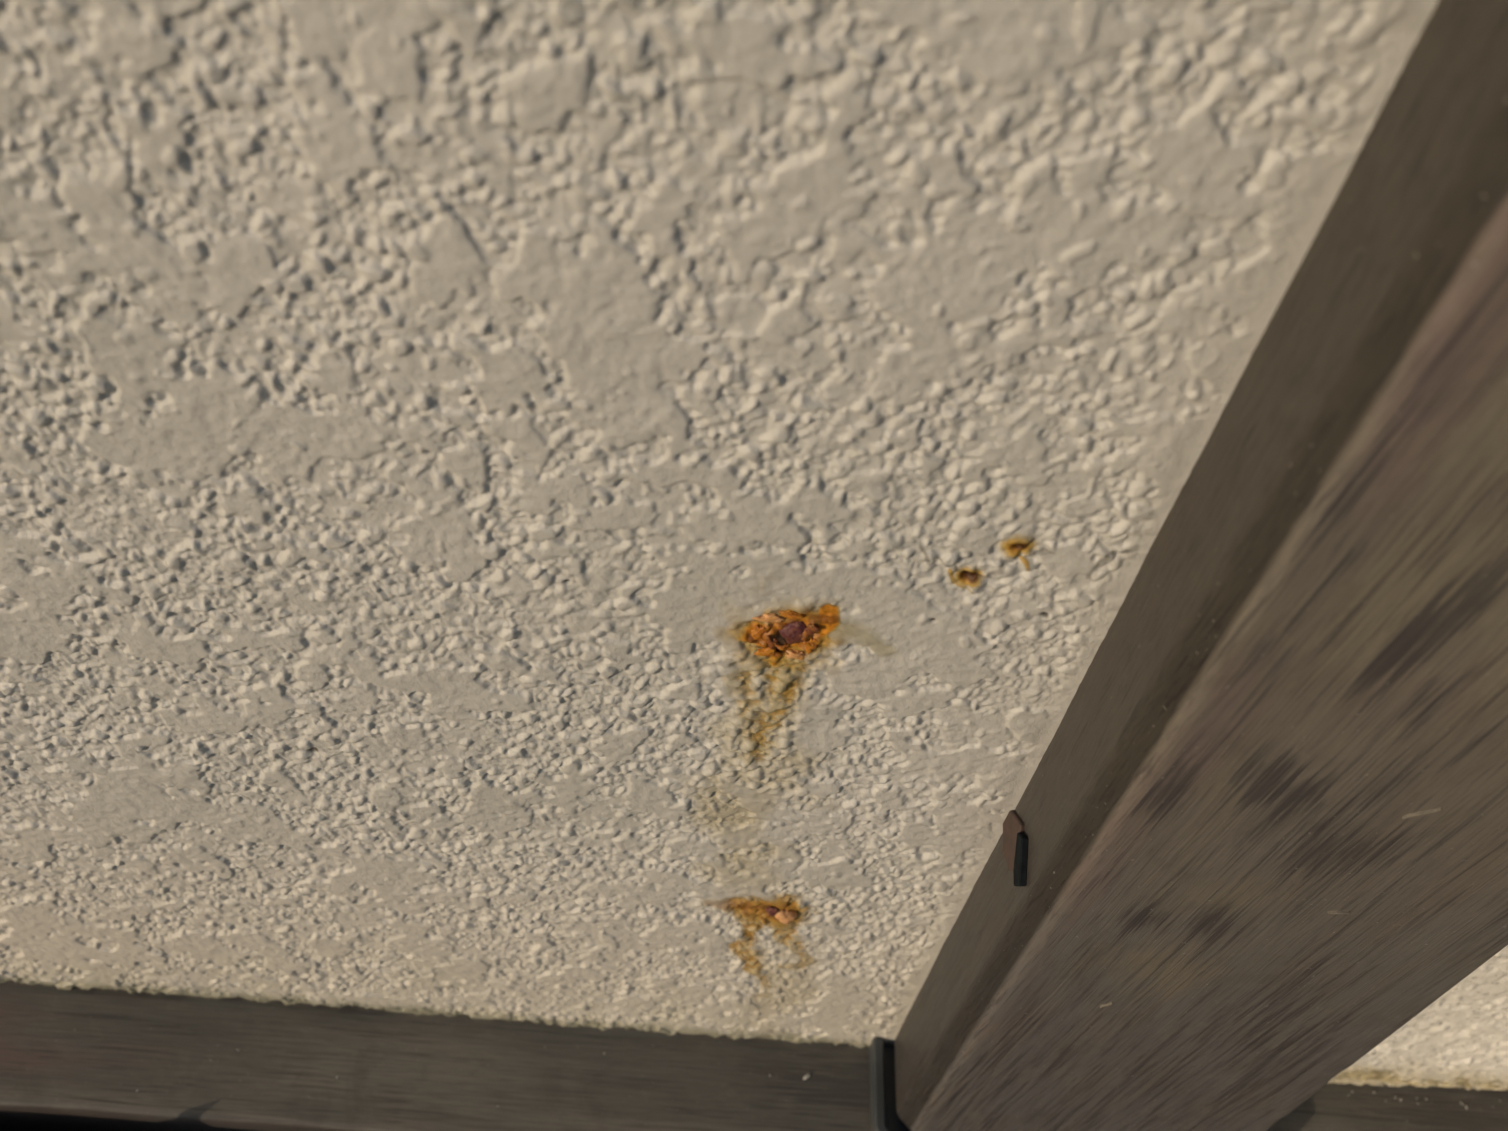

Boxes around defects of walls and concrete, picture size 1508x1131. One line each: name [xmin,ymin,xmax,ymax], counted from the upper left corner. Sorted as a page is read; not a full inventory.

corrosion [948,568,982,594]
corrosion [1002,538,1033,571]
corrosion [737,604,840,756]
corrosion [727,895,806,973]